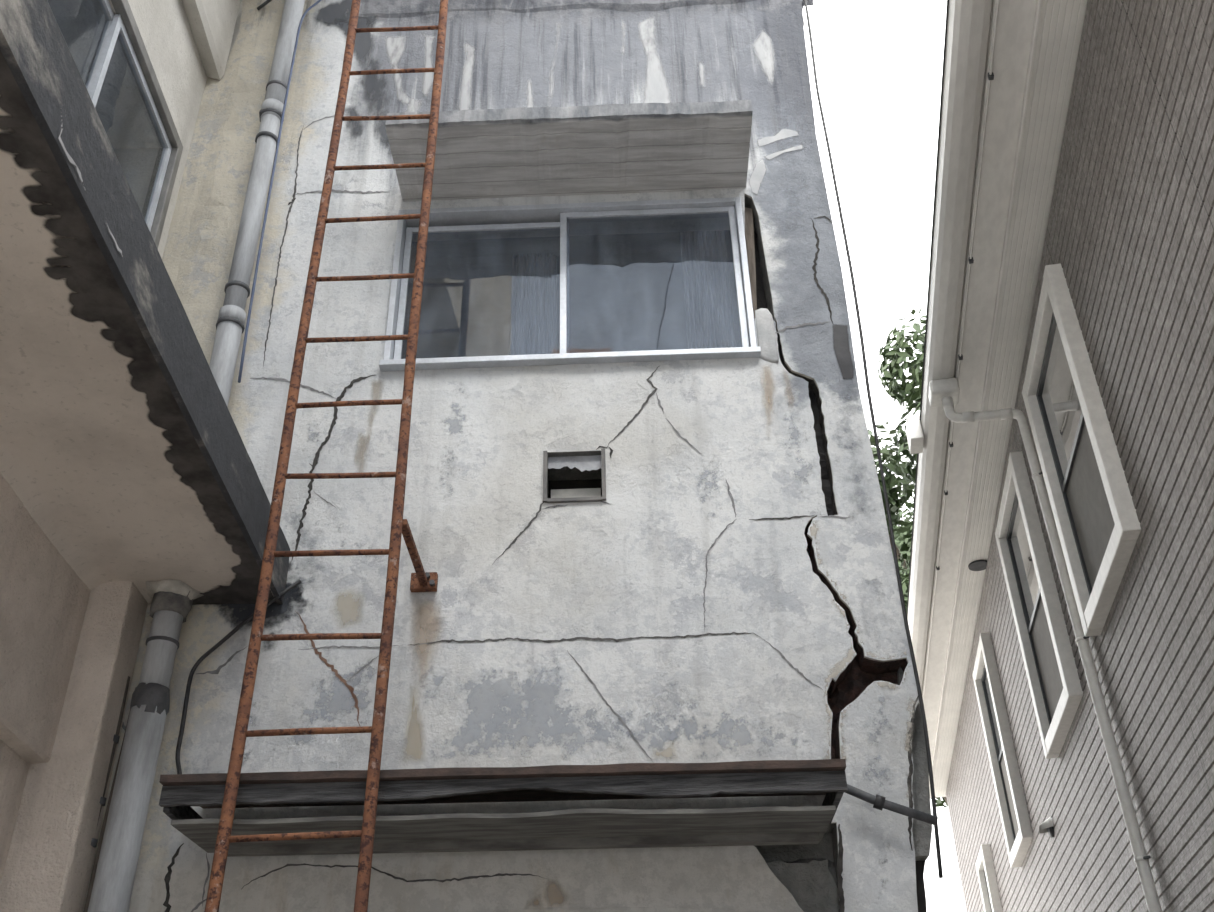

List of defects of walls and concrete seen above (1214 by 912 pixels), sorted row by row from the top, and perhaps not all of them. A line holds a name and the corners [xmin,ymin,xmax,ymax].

water stain [316,0,434,145]
water stain [459,44,474,110]
water stain [640,19,670,103]
water stain [753,32,774,81]
water stain [0,50,306,648]
crack [250,116,384,563]
crack [295,216,846,763]
peeling [444,669,795,757]
crack [163,843,210,912]
crack [241,863,547,890]